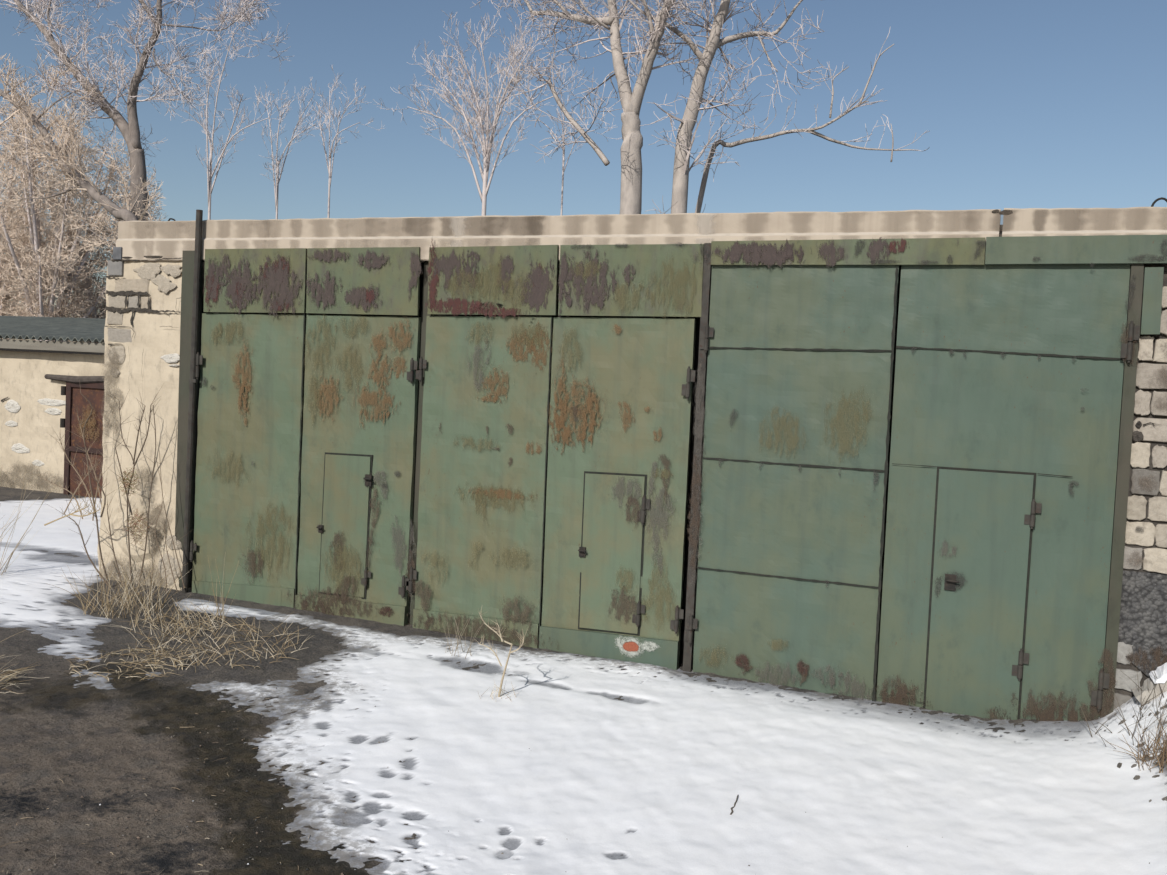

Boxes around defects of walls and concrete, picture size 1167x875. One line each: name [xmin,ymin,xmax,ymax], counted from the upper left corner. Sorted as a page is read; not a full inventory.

spalling [122,256,182,293]
rust [203,249,390,425]
rust [407,240,635,454]
rust [695,237,910,268]
rust [287,471,400,617]
rust [392,522,550,647]